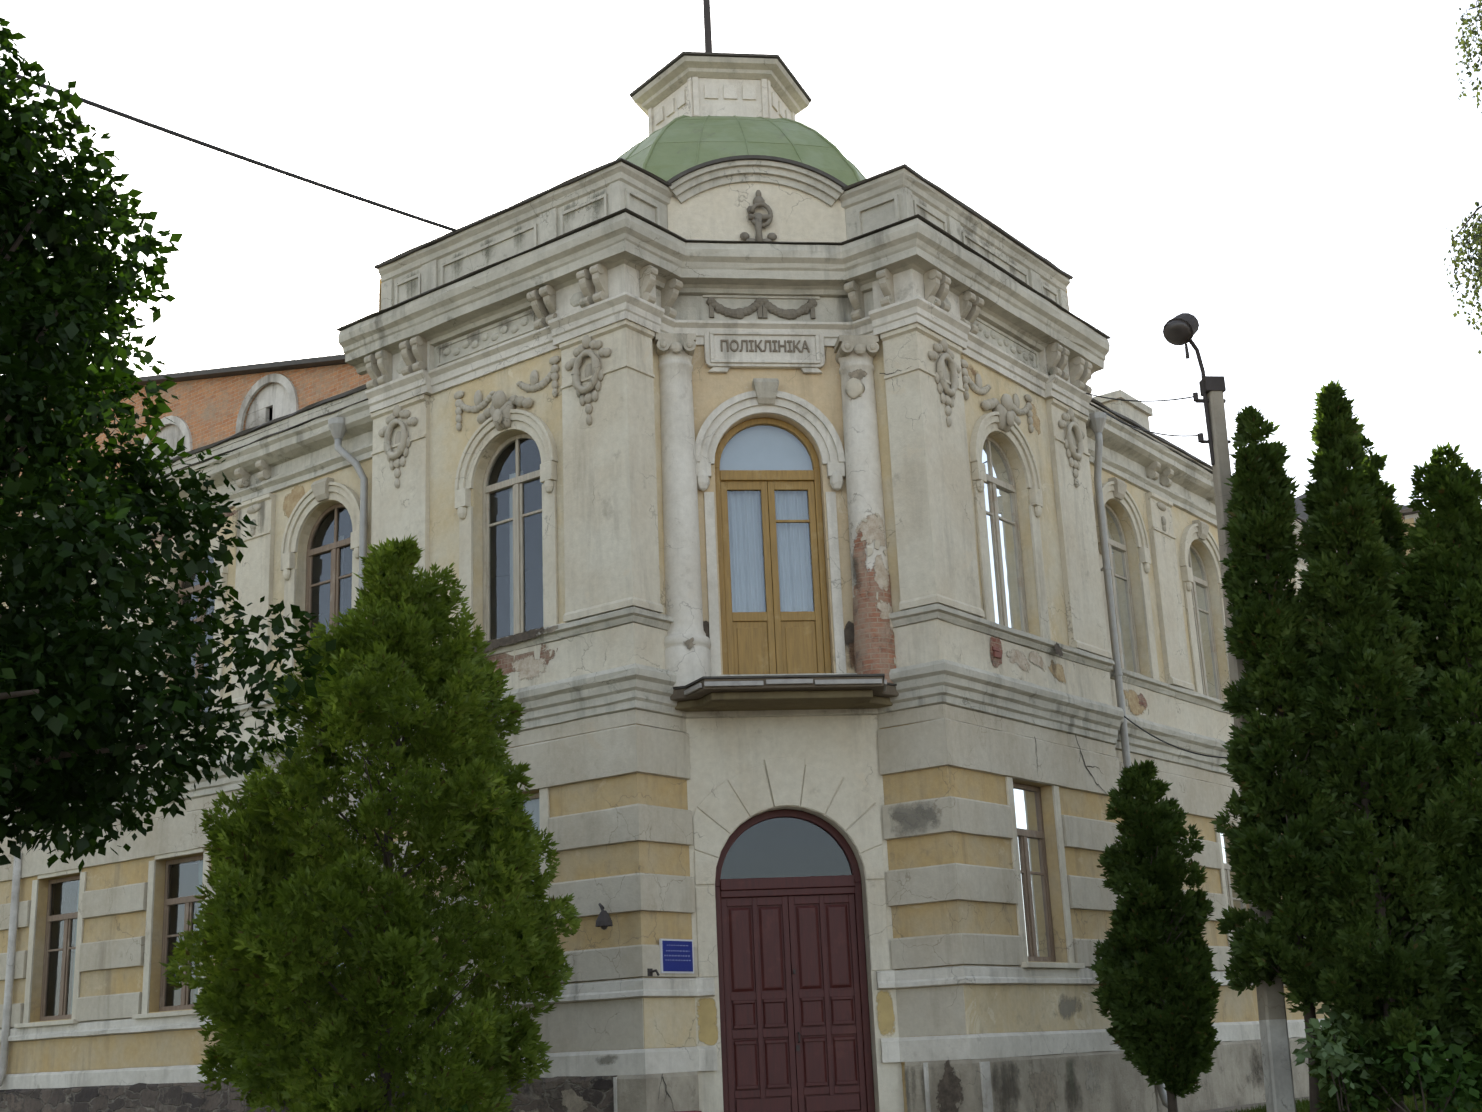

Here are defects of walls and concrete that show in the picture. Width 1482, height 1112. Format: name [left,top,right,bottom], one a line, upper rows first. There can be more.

flaking render [852,513,897,683]
peeling [482,625,558,692]
peeling [990,636,1066,684]
damp [894,805,937,834]